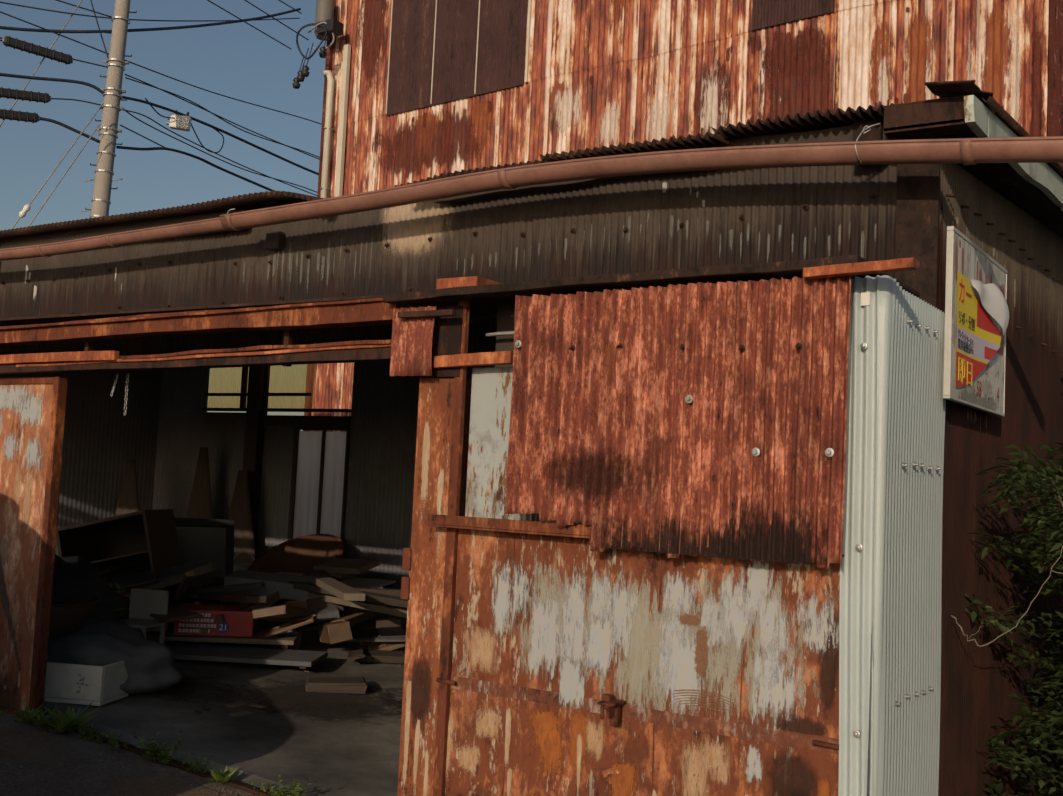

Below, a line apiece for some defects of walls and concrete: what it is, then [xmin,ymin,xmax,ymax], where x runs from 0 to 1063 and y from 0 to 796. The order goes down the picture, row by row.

rust [356,0,389,97]
rust [370,99,493,187]
rust [549,82,568,127]
rust [695,46,732,137]
rust [746,26,838,123]
peeling [0,384,44,471]
peeling [463,557,839,732]
rust [411,661,430,724]
peeling [446,707,499,777]
peeling [585,719,603,761]
peeling [682,739,729,796]
peeling [746,745,763,782]